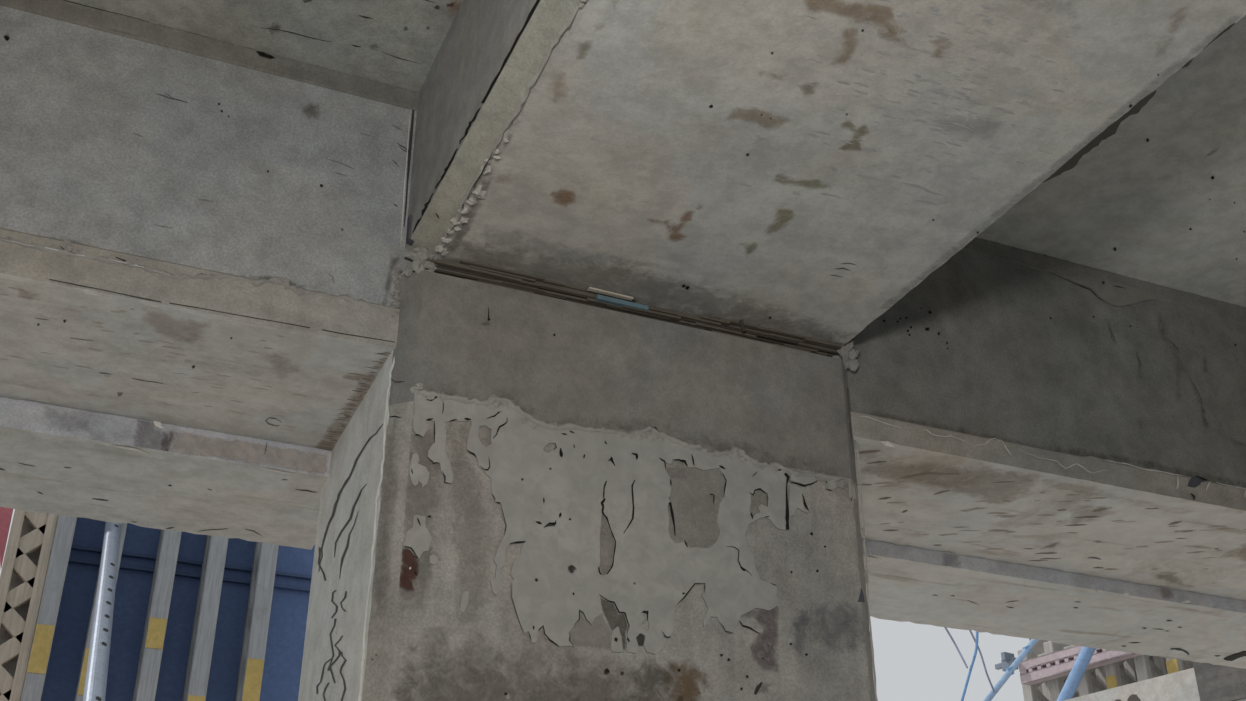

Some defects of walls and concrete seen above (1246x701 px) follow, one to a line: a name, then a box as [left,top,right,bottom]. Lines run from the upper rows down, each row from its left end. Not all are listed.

rust [554,191,573,204]
rust [400,549,419,591]
peeling [358,357,832,701]
spalling [848,440,878,701]